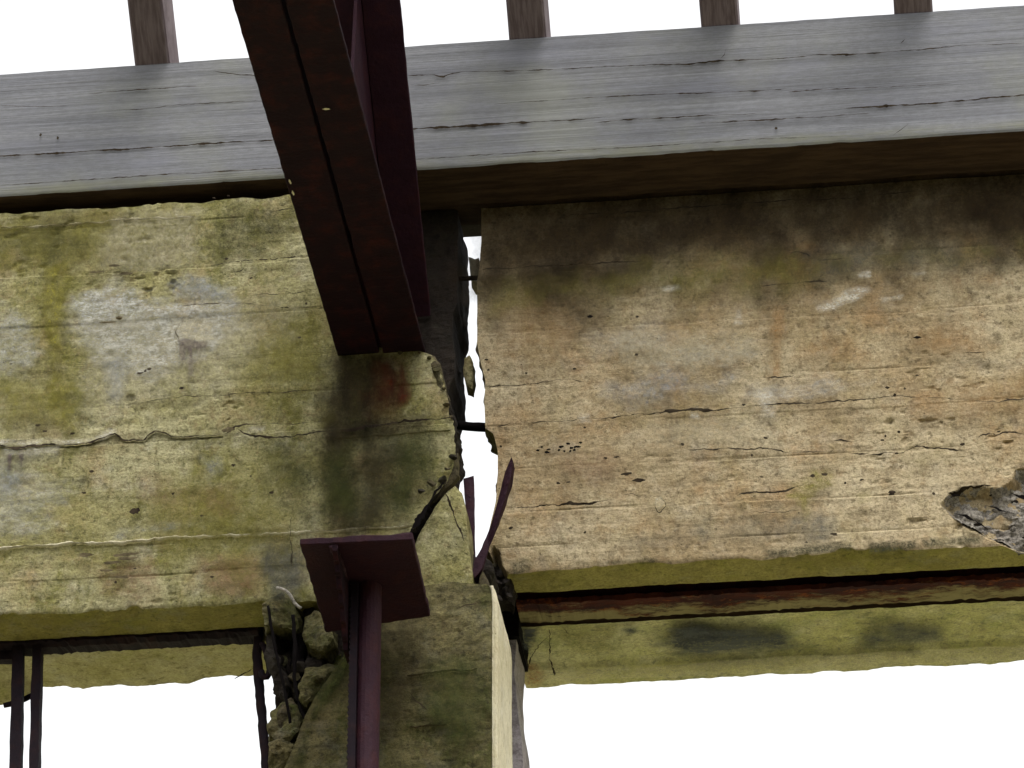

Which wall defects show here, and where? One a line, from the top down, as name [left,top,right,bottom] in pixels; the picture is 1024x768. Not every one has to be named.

water stain [480,169,1024,290]
water stain [73,279,239,392]
spalling [418,351,485,432]
peeling [463,355,489,397]
crack [0,417,450,450]
water stain [321,355,436,530]
crack [688,431,1021,456]
crack [410,481,465,542]
spalling [932,470,1024,555]
spalling [262,592,344,768]
water stain [653,627,807,674]